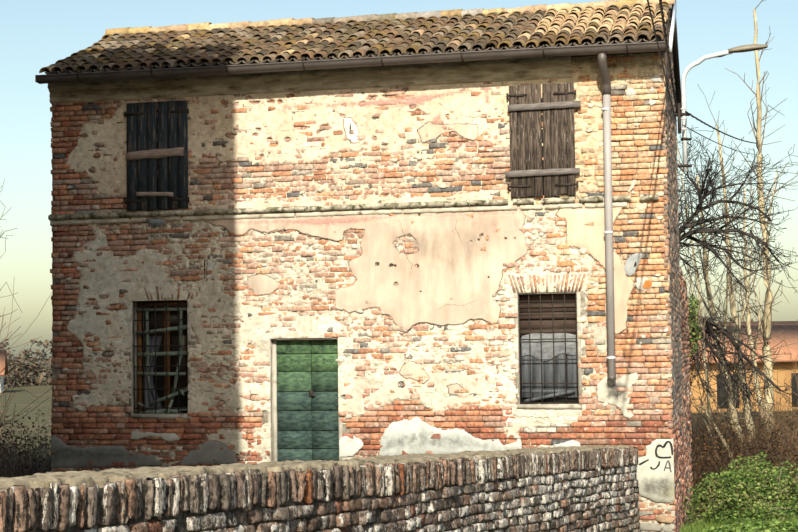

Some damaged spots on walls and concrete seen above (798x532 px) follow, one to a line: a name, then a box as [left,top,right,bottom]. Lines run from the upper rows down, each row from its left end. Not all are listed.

flaking render [50,53,673,472]